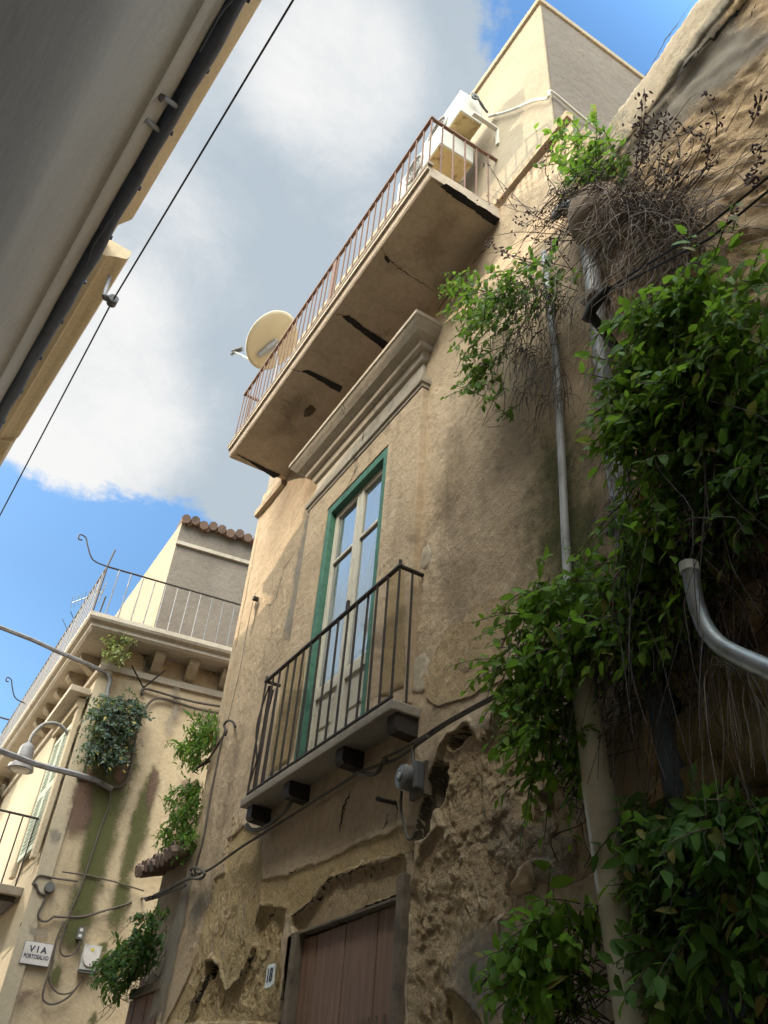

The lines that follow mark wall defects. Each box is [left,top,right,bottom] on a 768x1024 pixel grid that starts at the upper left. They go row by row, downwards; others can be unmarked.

crack [380,246,485,311]
crack [339,792,350,832]
spalling [166,701,593,1024]